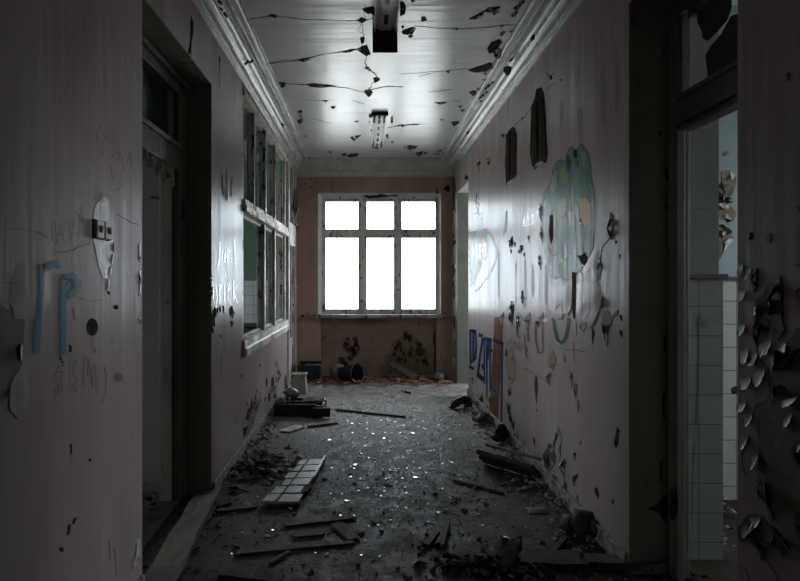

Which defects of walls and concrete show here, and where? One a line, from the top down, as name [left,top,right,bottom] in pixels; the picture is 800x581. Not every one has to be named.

crack [246,3,468,123]
peeling [401,17,427,38]
crack [418,23,515,31]
peeling [470,7,500,19]
peeling [468,31,513,102]
peeling [92,196,115,295]
mould [338,336,360,366]
leakage [389,331,429,374]
peeling [243,361,282,437]
peeling [731,264,800,562]
peeling [542,427,581,502]